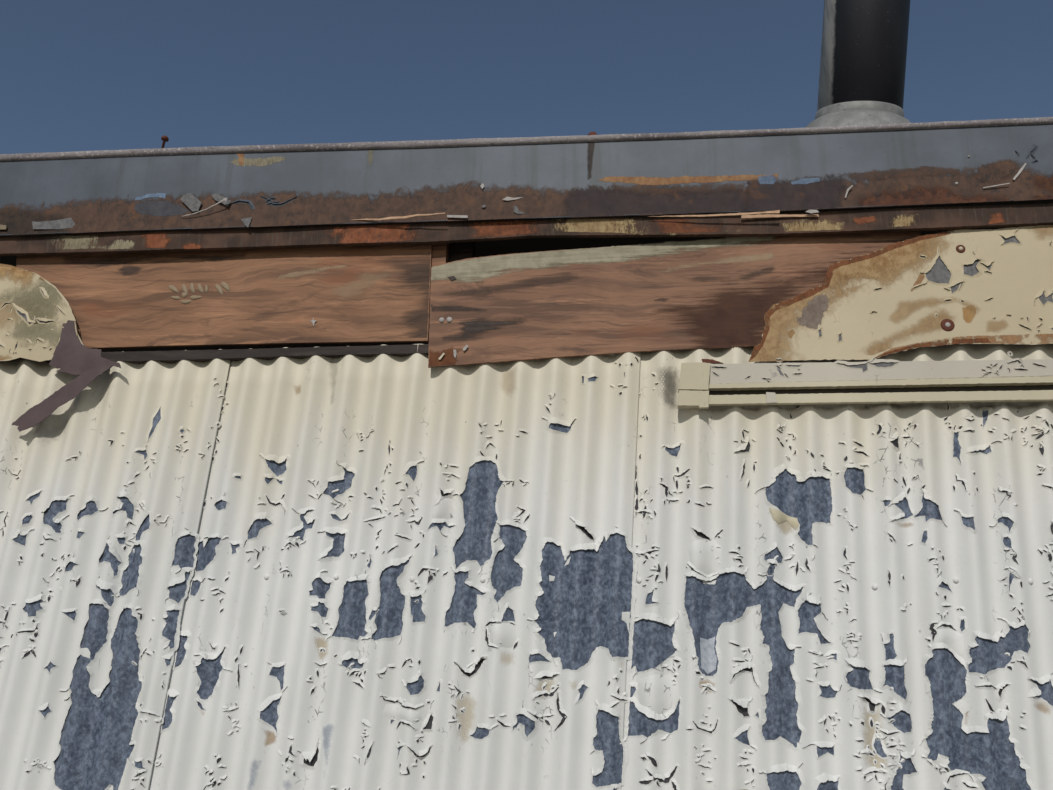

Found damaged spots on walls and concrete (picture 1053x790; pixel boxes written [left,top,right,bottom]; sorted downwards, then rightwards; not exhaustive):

rust [0,142,1053,248]
rust [0,264,45,285]
peeling [919,246,995,295]
peeling [259,453,291,486]
peeling [951,425,1003,466]
peeling [285,460,428,671]
peeling [10,489,154,790]
peeling [159,512,275,711]
peeling [426,456,1036,790]
peeling [256,660,289,737]
peeling [396,669,443,760]
peeling [1027,670,1053,708]